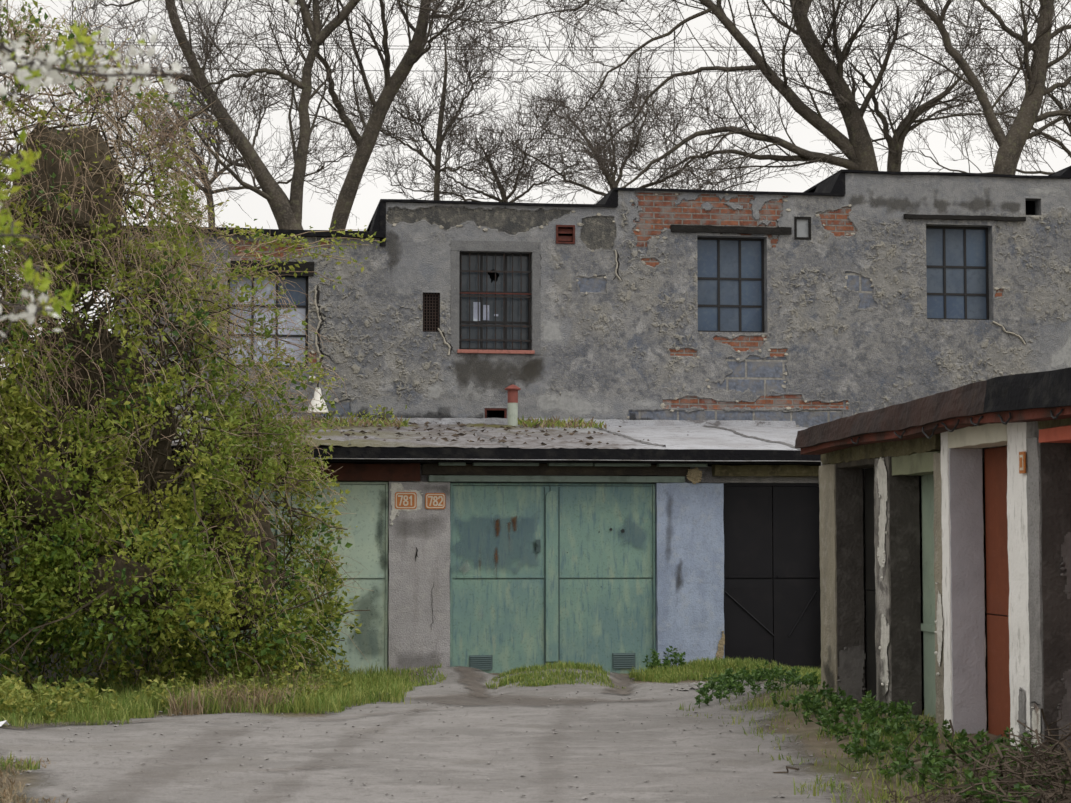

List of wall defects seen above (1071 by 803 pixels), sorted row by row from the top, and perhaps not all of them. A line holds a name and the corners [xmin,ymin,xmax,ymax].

flaking render [630,193,791,267]
flaking render [815,204,857,237]
flaking render [713,335,788,361]
flaking render [660,372,849,412]
corrosion [494,517,517,564]
peeling [877,457,888,580]